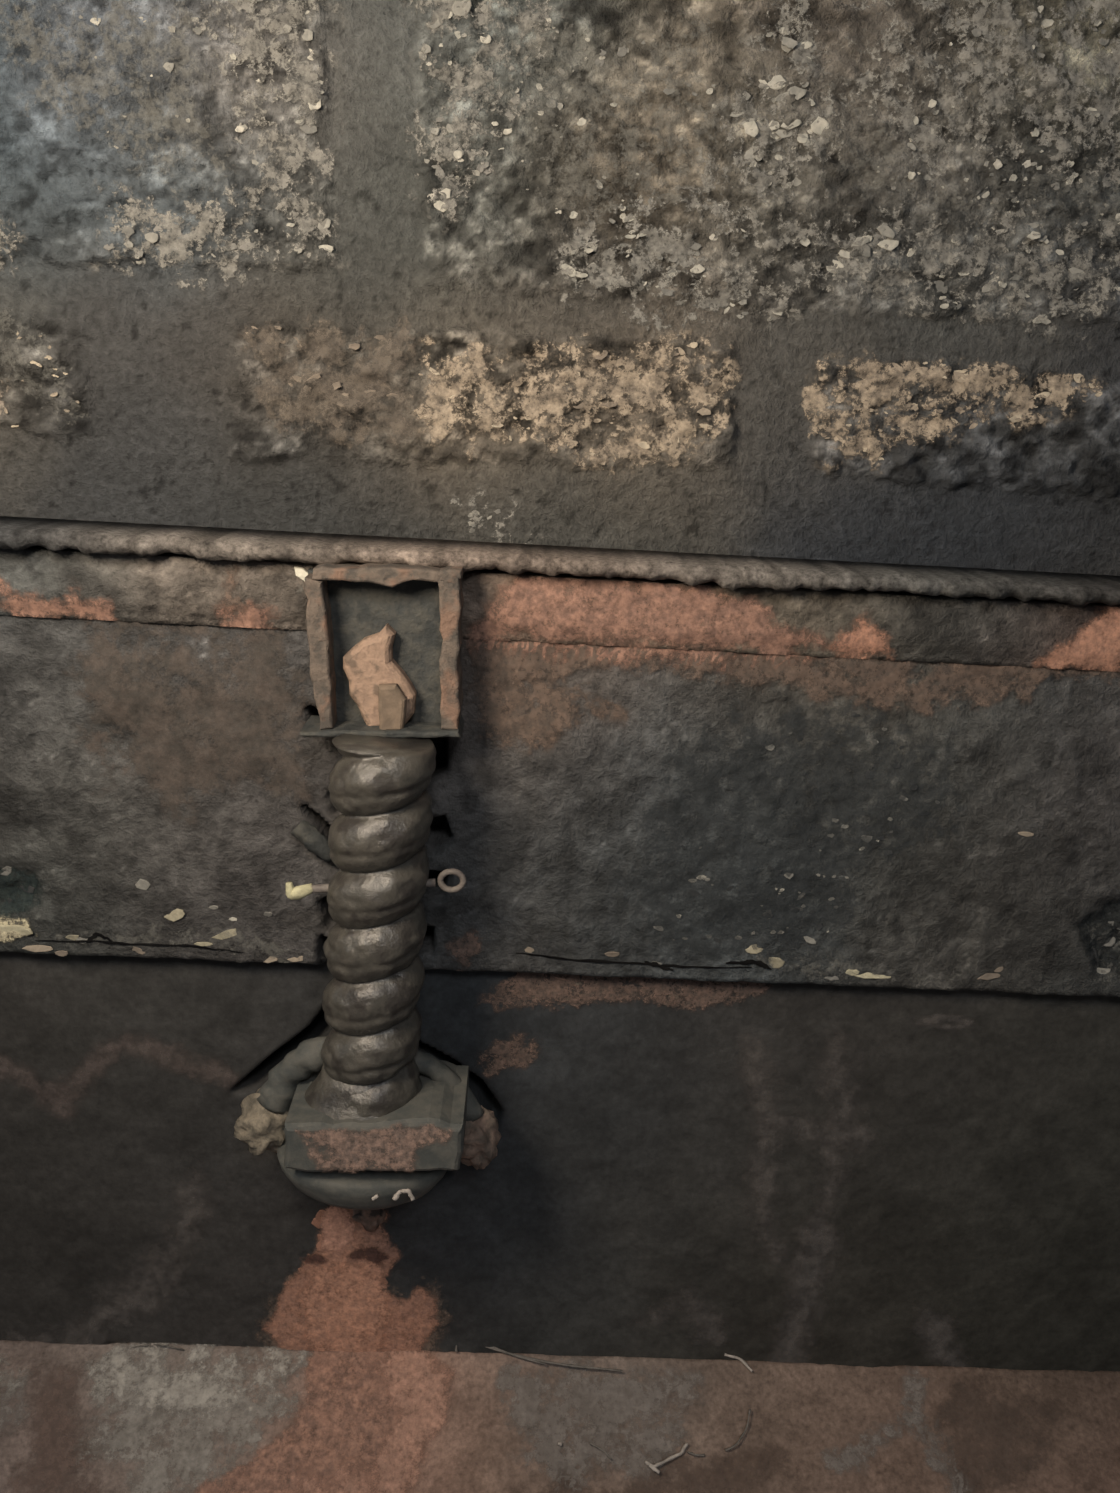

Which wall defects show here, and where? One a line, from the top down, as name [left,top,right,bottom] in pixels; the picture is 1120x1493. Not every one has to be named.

corrosion [0,579,114,621]
corrosion [217,565,268,629]
corrosion [468,576,1120,752]
peeling [135,879,150,890]
peeling [0,917,87,957]
peeling [164,908,185,922]
peeling [194,905,237,946]
crack [519,953,771,971]
corrosion [195,1206,454,1493]